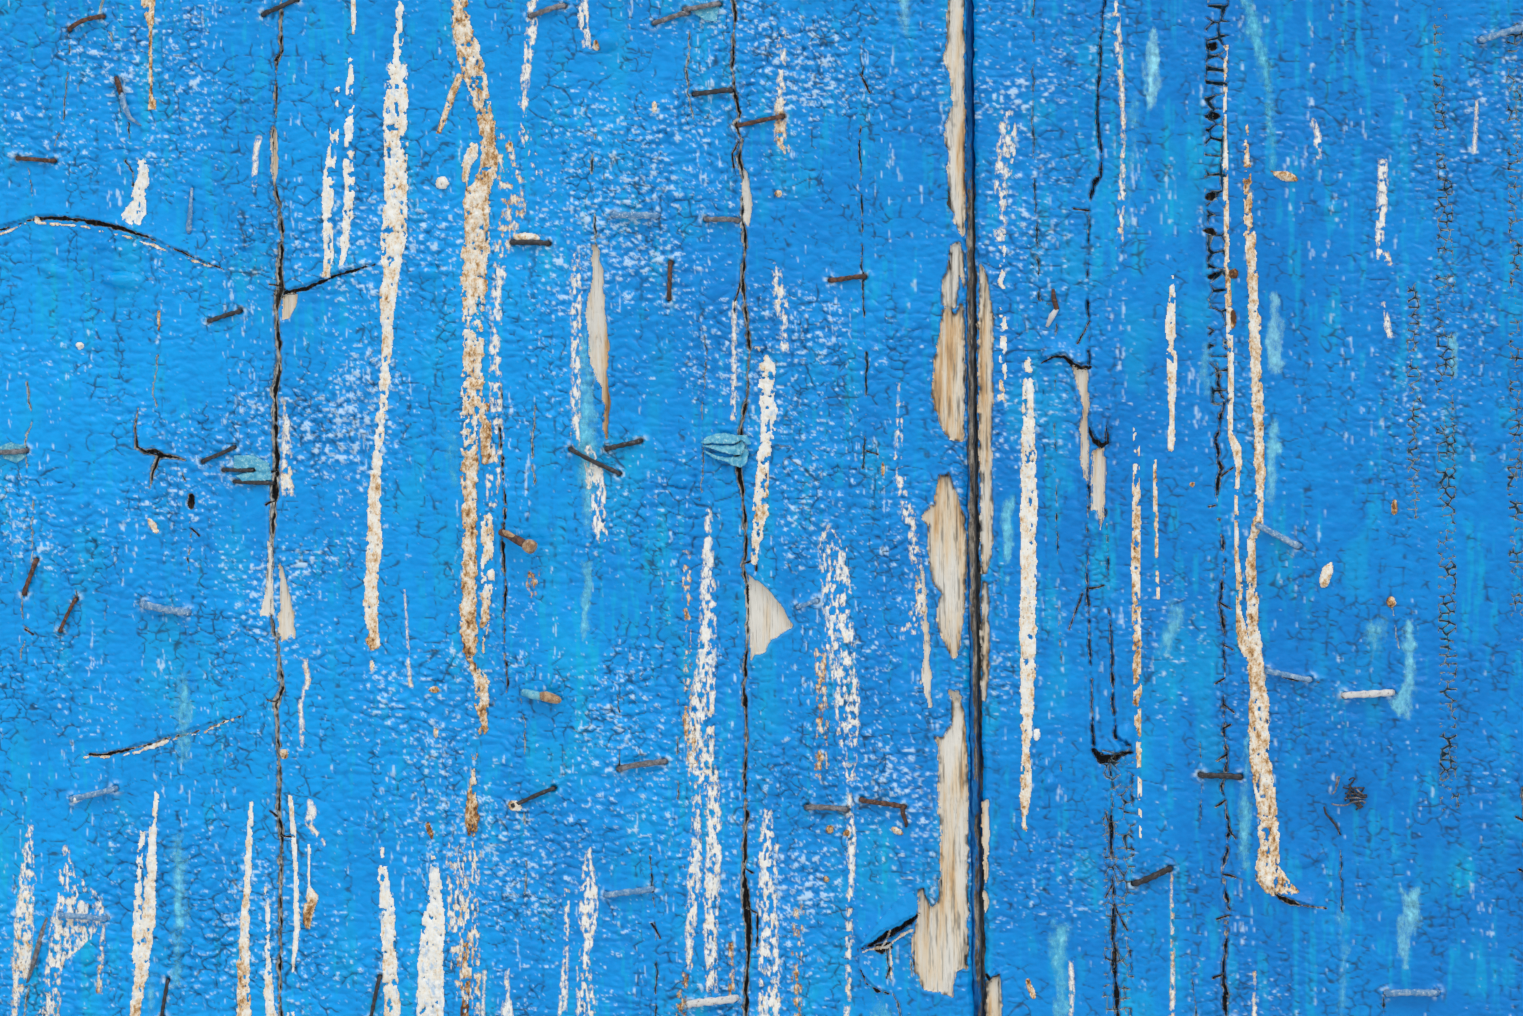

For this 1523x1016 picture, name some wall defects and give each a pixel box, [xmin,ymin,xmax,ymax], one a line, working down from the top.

crack [0,35,224,271]
crack [83,0,375,1016]
peeling [363,1,409,671]
peeling [377,753,513,1016]
peeling [436,0,543,734]
crack [685,32,694,119]
peeling [676,509,735,1016]
crack [699,0,759,1016]
peeling [701,267,793,660]
peeling [814,0,1040,1016]
peeling [1203,42,1299,896]
crack [1192,0,1343,1016]